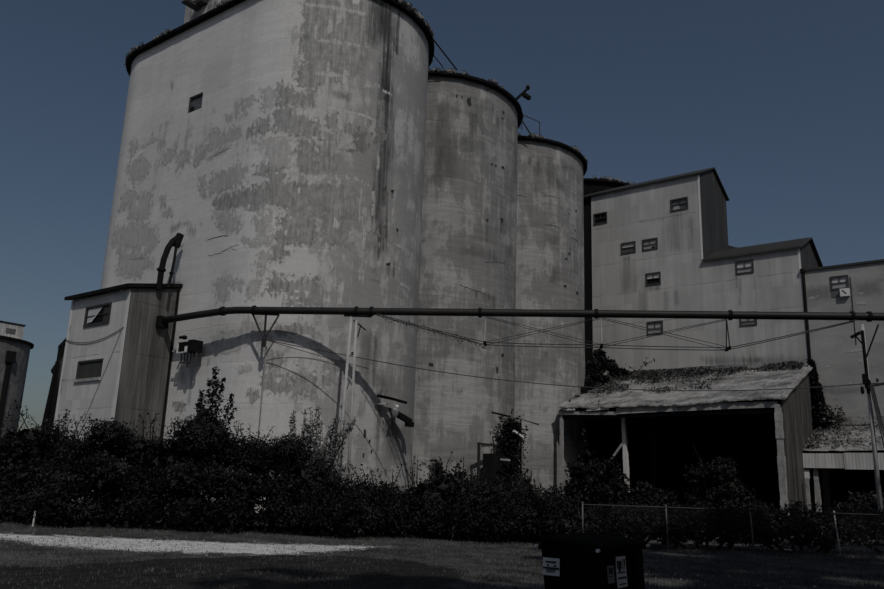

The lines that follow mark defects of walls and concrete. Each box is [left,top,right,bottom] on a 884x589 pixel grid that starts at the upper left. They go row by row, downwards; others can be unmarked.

peeling [111,136,174,281]
peeling [161,0,388,307]
damp [281,0,415,284]